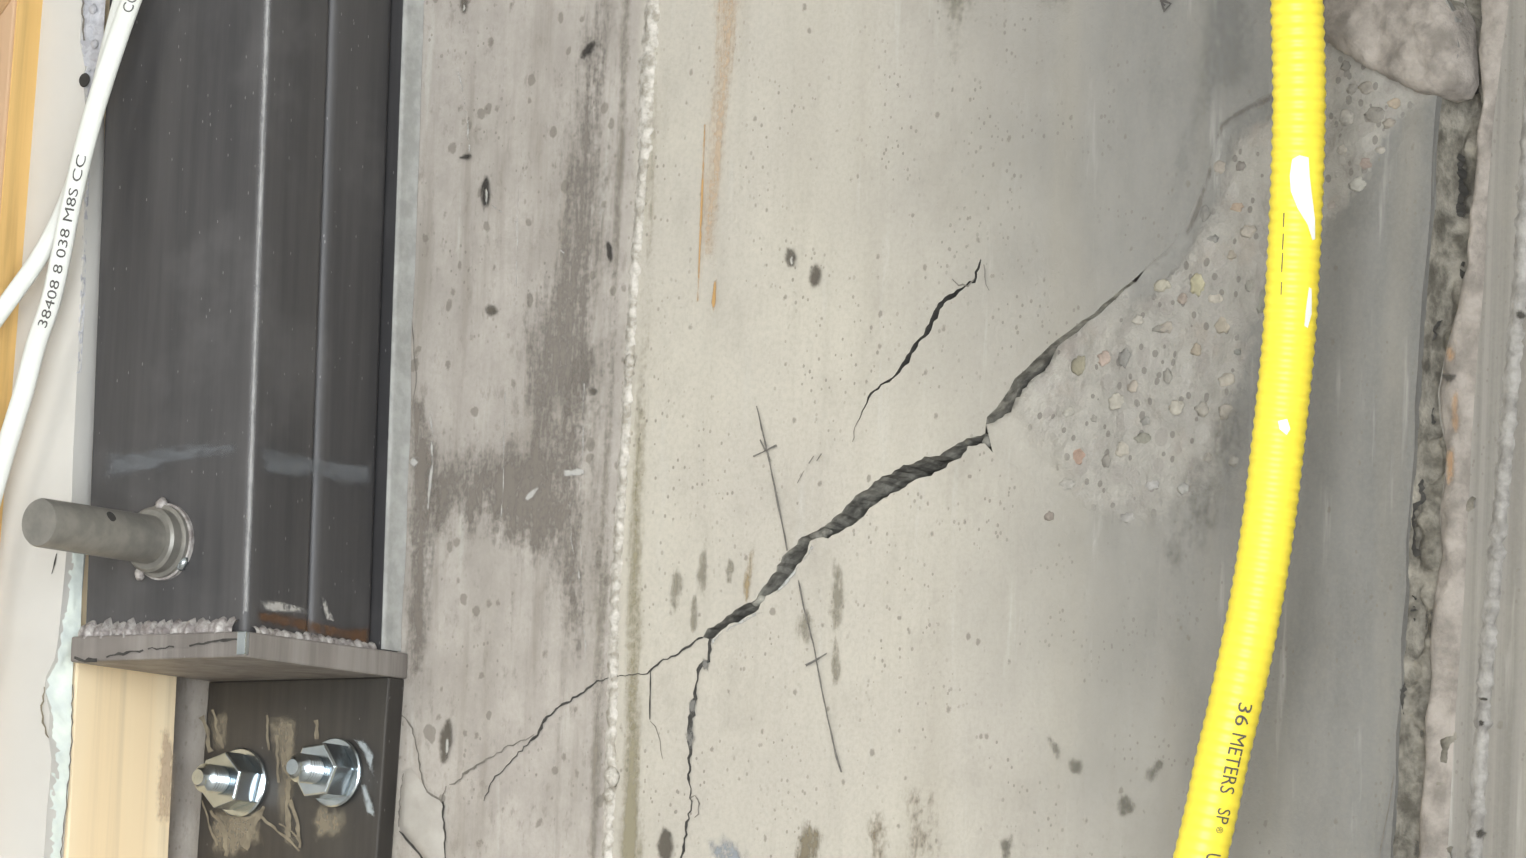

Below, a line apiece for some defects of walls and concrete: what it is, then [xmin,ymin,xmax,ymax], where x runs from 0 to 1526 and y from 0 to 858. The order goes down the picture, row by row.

crack [410,326,418,406]
water stain [408,43,625,671]
rust [697,21,731,307]
crack [852,259,989,442]
spalling [986,92,1273,553]
spalling [1319,0,1509,858]
crack [449,433,993,858]